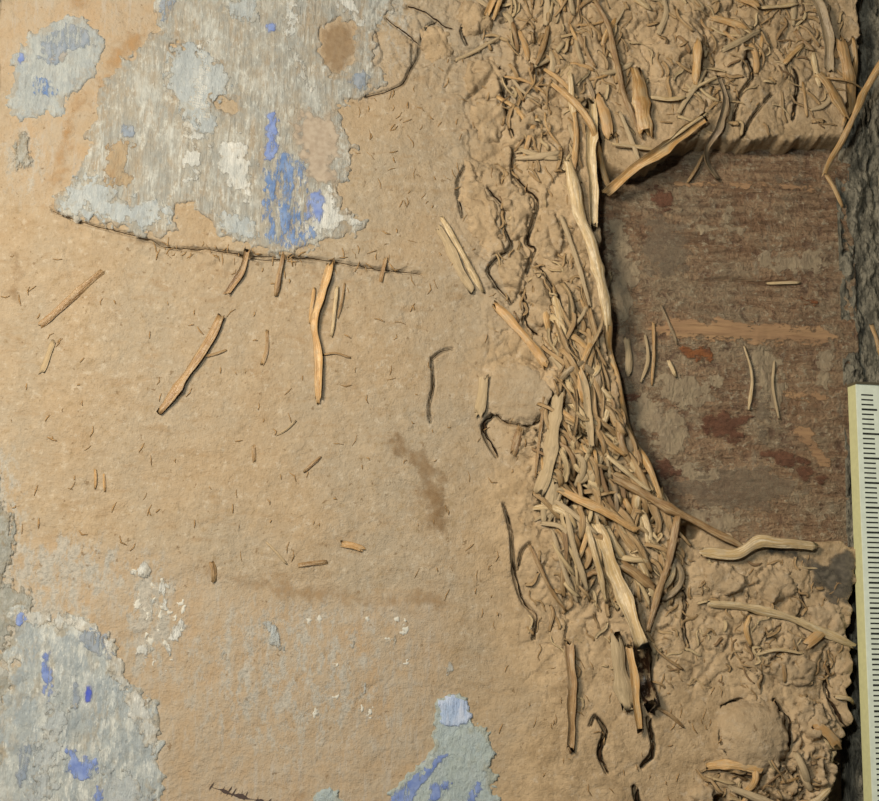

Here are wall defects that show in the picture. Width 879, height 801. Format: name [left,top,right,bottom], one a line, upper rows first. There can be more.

peeling [5,0,398,259]
crack [53,211,420,275]
spalling [458,160,564,327]
spalling [704,561,798,605]
peeling [0,501,167,801]
peeling [130,561,187,671]
spalling [764,652,820,687]
spalling [806,602,849,644]
peeling [313,787,344,801]
peeling [387,691,501,801]
spalling [689,783,715,801]
spalling [811,748,838,801]